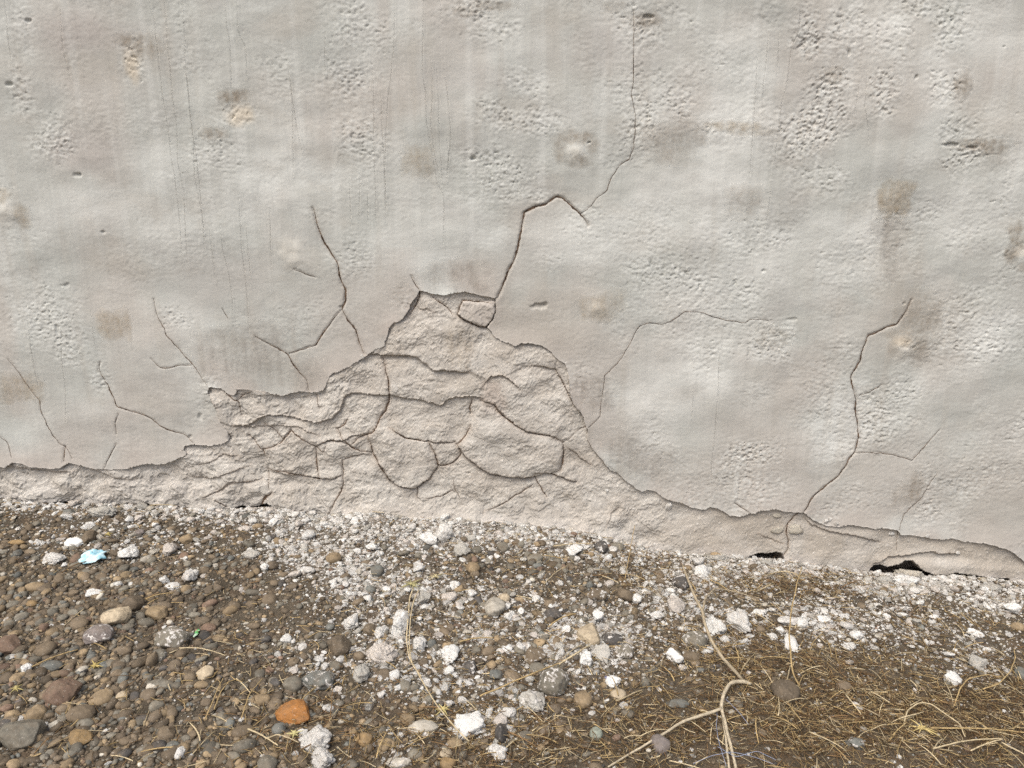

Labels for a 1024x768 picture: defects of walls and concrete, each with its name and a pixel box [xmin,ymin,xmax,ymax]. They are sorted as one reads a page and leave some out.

crack [411,14,636,328]
crack [9,361,72,461]
crack [99,363,191,468]
crack [153,299,248,414]
crack [206,212,763,511]
spalling [0,282,1024,581]
crack [784,300,930,555]